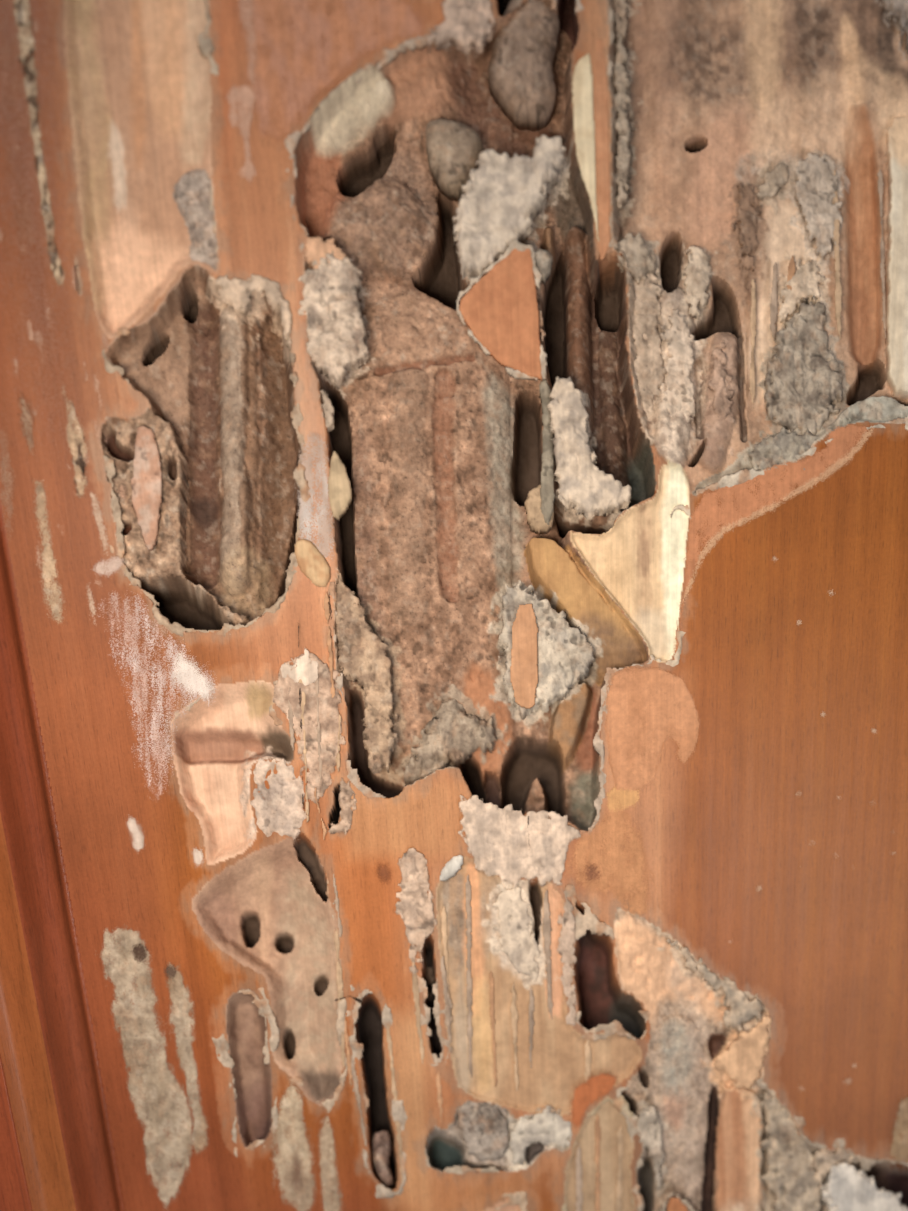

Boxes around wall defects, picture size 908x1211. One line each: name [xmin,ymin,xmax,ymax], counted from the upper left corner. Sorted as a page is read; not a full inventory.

spalling [83,0,908,832]
peeling [126,816,145,852]
spalling [166,648,373,1113]
peeling [440,855,463,881]
spalling [131,942,148,964]
spalling [382,1003,393,1030]
spalling [417,975,453,1067]
spalling [557,884,908,1211]
spalling [212,1034,279,1157]
spalling [362,1149,406,1198]
spalling [391,1099,407,1131]
spalling [425,1100,577,1211]